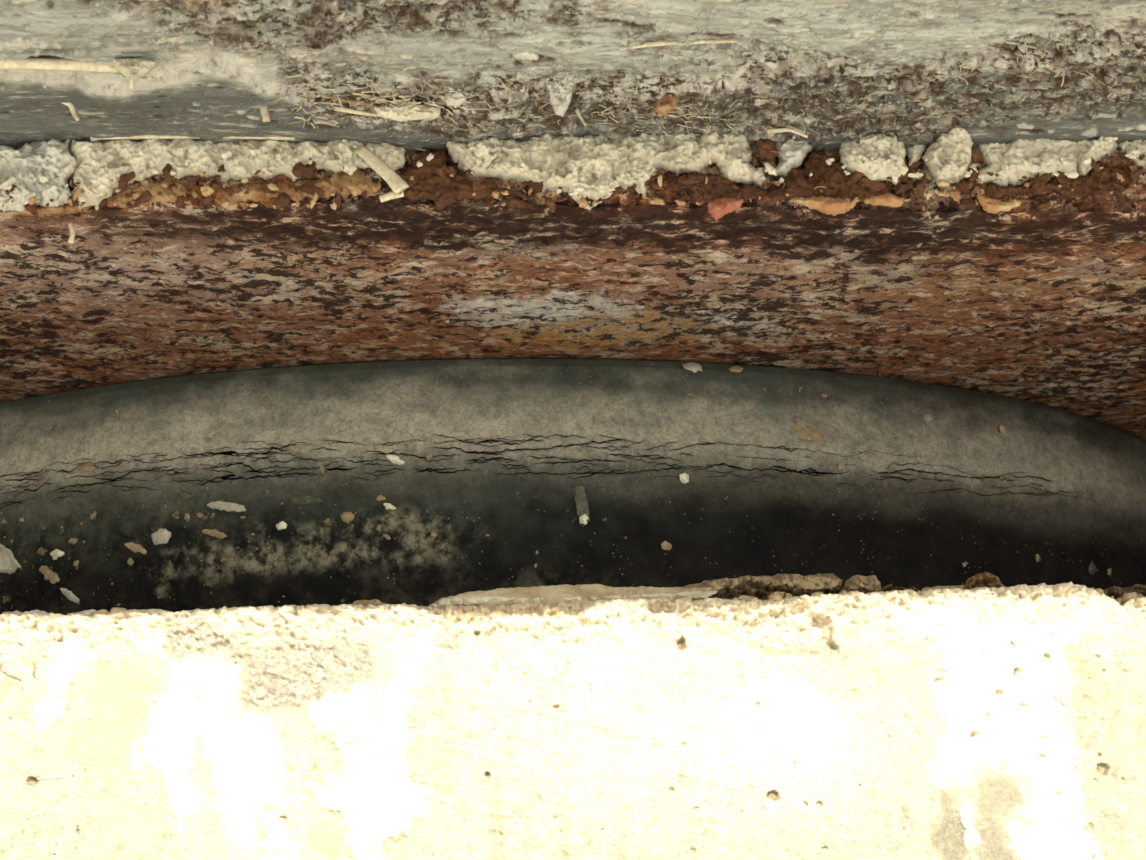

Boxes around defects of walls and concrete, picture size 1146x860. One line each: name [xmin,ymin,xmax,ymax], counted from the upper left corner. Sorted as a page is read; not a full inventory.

corrosion [754,138,778,162]
corrosion [707,197,744,220]
corrosion [793,193,906,216]
corrosion [977,195,1021,214]
crack [0,434,1095,509]
leakage [134,657,299,860]
leakage [312,628,436,860]
leakage [894,604,1123,860]